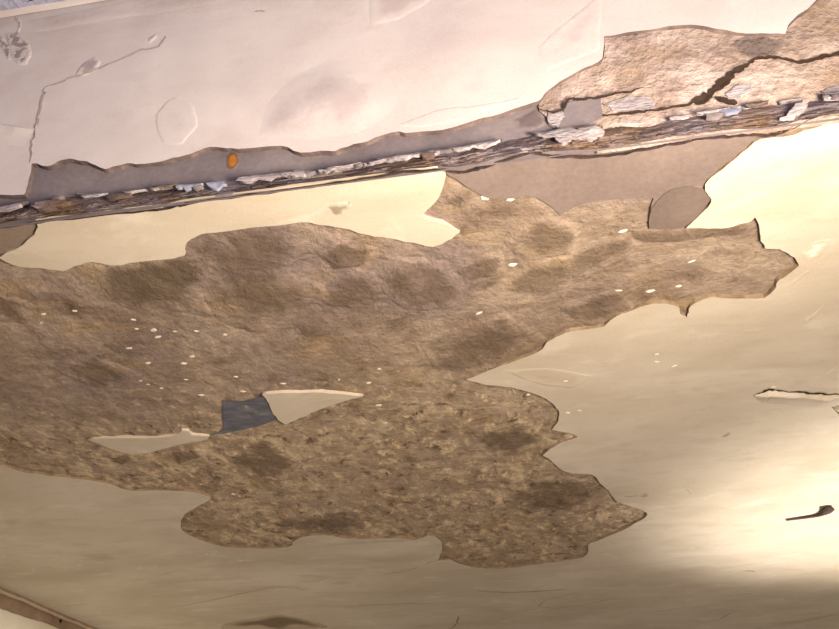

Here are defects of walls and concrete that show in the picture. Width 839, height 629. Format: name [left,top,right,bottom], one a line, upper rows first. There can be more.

crack [0,37,166,162]
rust [226,152,239,170]
flaking render [0,0,839,228]
flaking render [0,136,799,569]
flaking render [753,386,839,414]
flaking render [786,506,835,521]